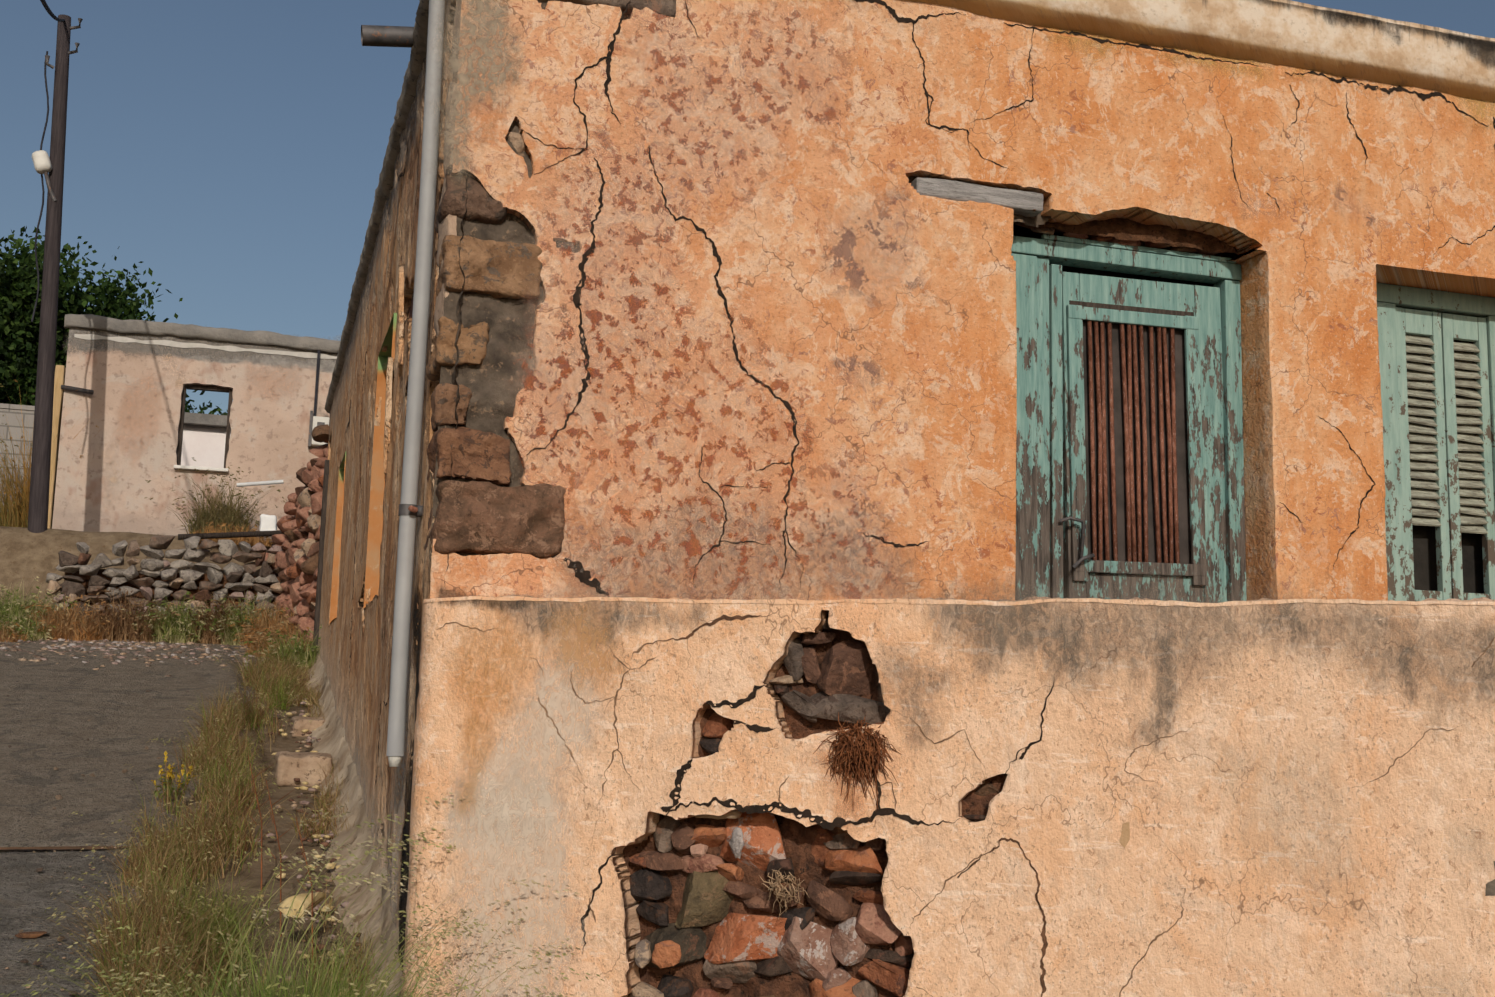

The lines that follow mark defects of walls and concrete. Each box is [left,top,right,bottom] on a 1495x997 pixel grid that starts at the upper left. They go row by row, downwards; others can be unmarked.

crack [855,0,1495,173]
spalling [384,266,414,474]
spalling [425,0,883,588]
crack [513,0,960,830]
peeling [832,216,907,284]
crack [1321,418,1376,569]
spalling [623,600,914,997]
crack [890,669,1059,776]
spalling [961,774,1008,822]
crack [581,847,616,954]
crack [909,838,1048,997]
spalling [1485,861,1495,896]